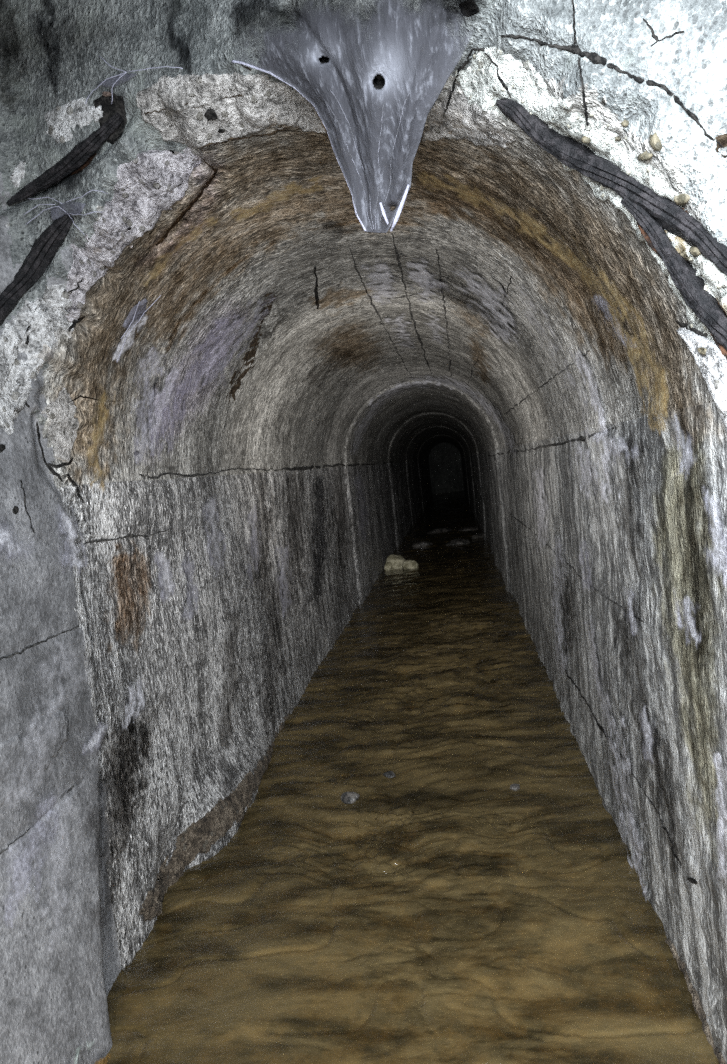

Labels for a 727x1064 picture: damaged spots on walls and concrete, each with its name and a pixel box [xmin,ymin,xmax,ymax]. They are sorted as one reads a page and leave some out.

crack [444,0,725,148]
spalling [0,72,327,435]
spalling [421,46,727,433]
leakage [112,316,148,360]
leakage [194,319,243,391]
leakage [384,313,414,353]
leakage [362,260,519,346]
leakage [147,369,179,449]
leakage [351,375,516,454]
leakage [570,351,636,504]
leakage [675,414,690,473]